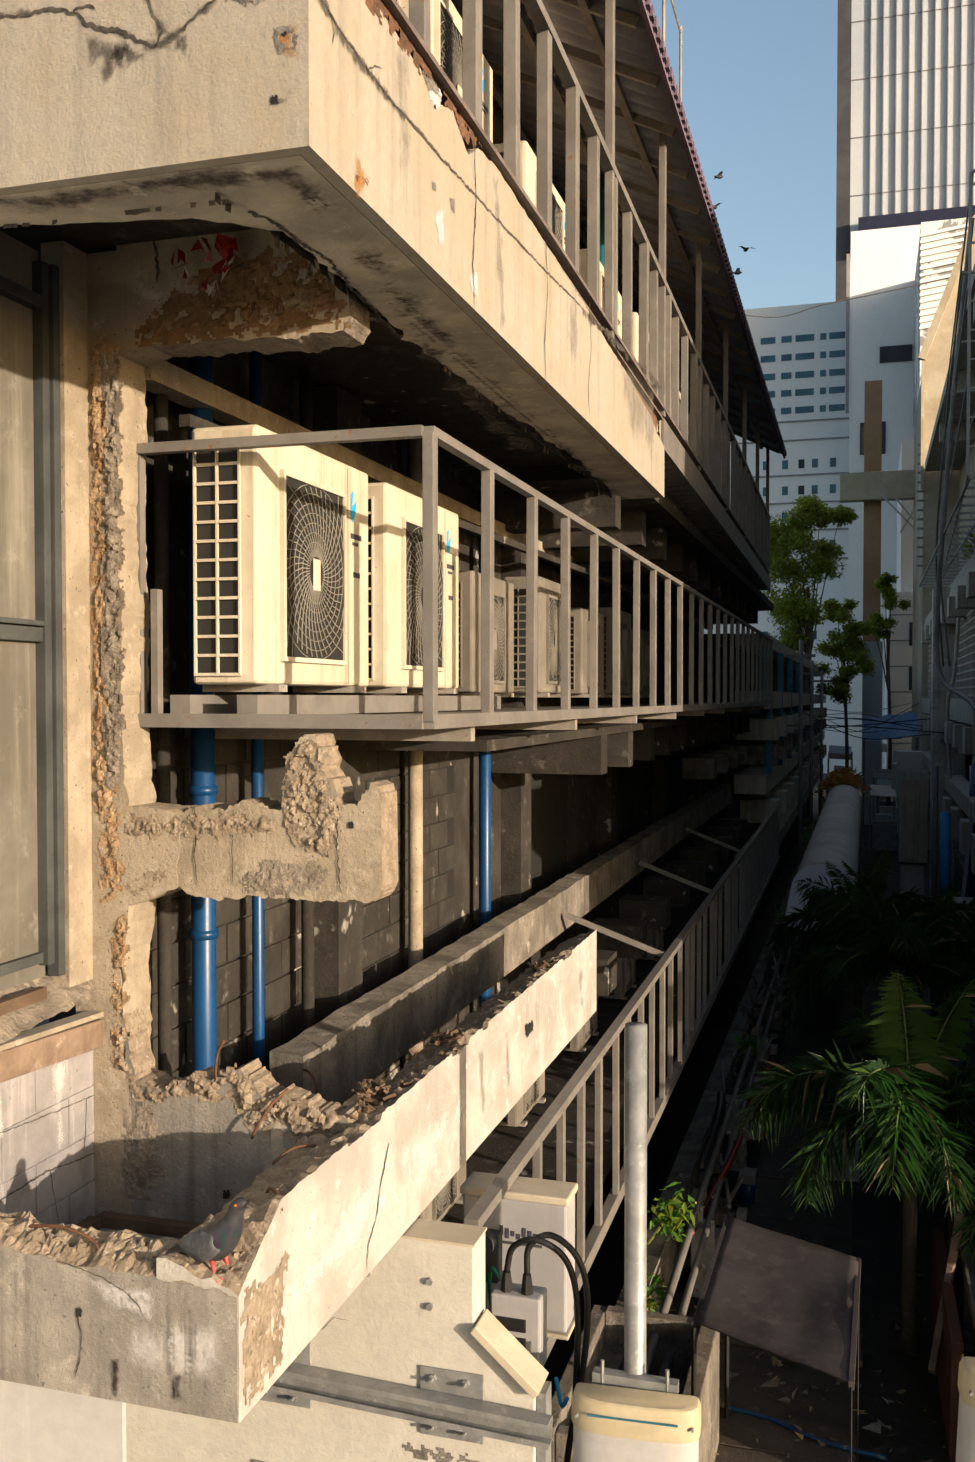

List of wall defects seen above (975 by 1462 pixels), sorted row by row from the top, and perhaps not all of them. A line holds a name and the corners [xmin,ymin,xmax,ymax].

crack [0,0,215,50]
spalling [124,207,162,215]
spalling [191,192,231,213]
crack [320,0,665,414]
crack [152,240,160,283]
spalling [268,230,347,294]
crack [248,211,401,340]
spalling [444,365,612,499]
peeling [87,334,168,1072]
spalling [240,859,328,899]
spalling [121,1099,167,1201]
peeling [248,1088,316,1169]